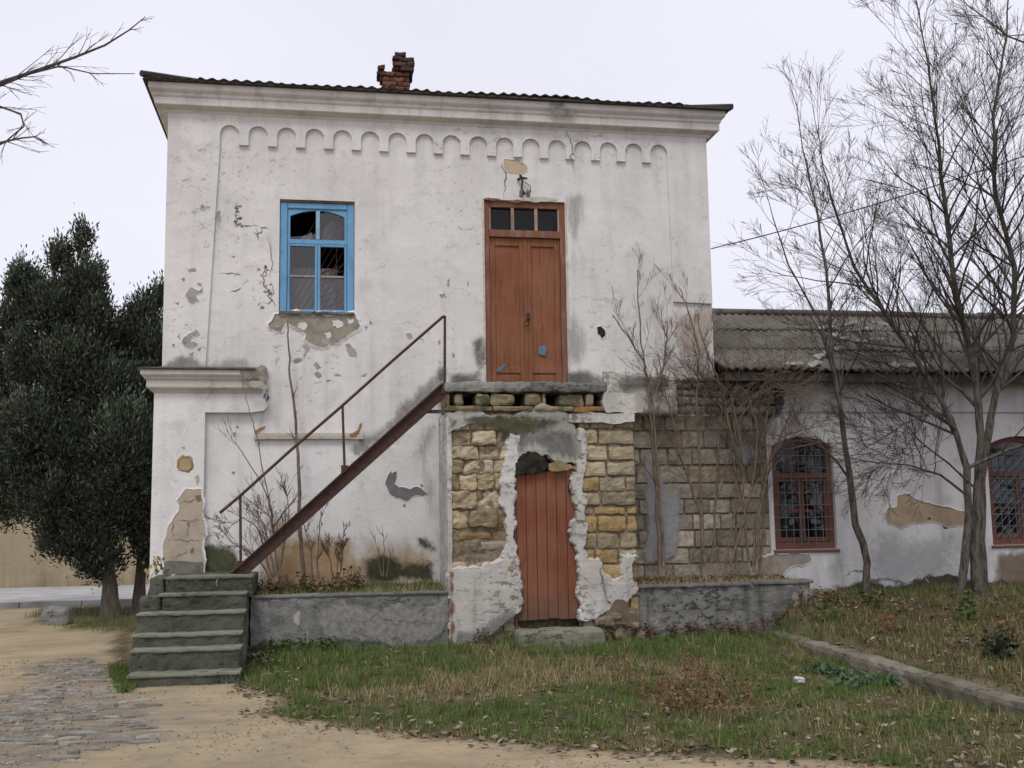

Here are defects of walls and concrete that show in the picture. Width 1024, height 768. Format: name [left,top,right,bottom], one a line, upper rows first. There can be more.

flaking render [503,158,528,175]
crack [226,203,275,309]
flaking render [175,268,204,306]
flaking render [172,329,201,356]
flaking render [265,309,372,382]
spalling [161,446,208,575]
flaking render [384,470,429,507]
spalling [450,377,813,626]
flaking render [884,493,965,530]